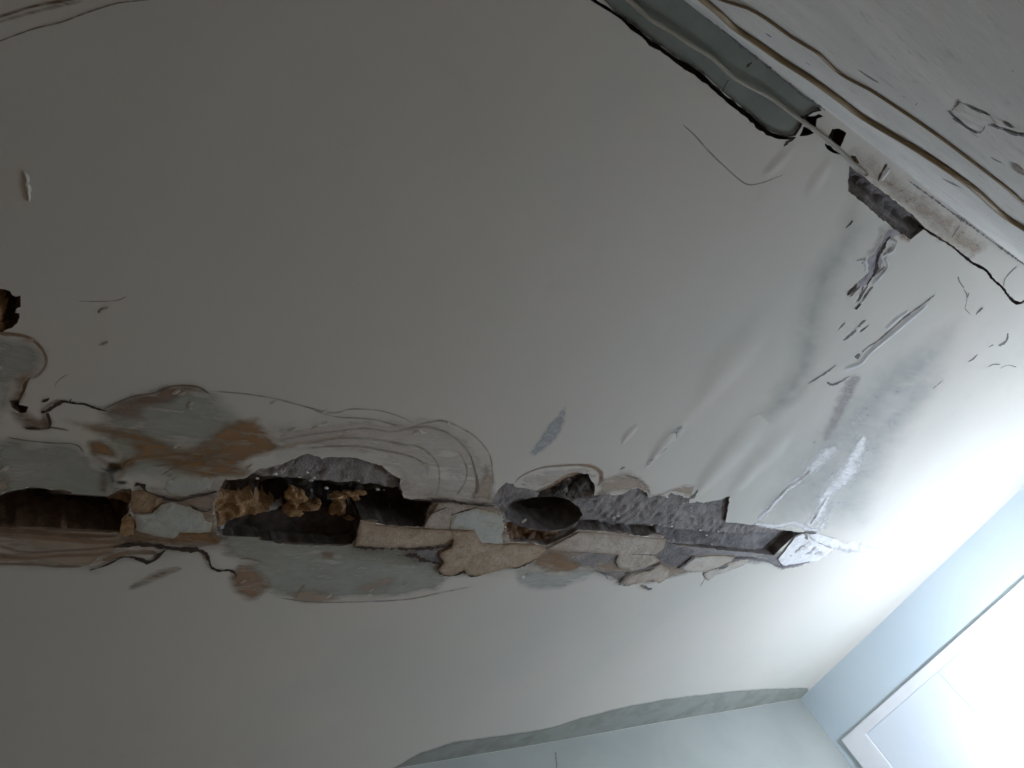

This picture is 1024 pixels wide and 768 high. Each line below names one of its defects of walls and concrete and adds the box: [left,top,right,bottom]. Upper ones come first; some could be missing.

crack [591,0,825,146]
crack [948,101,1024,137]
crack [686,127,777,185]
flaking render [825,129,925,310]
crack [878,164,1024,315]
flaking render [0,289,21,332]
flaking render [10,377,31,413]
flaking render [0,454,804,586]
crack [90,543,237,577]